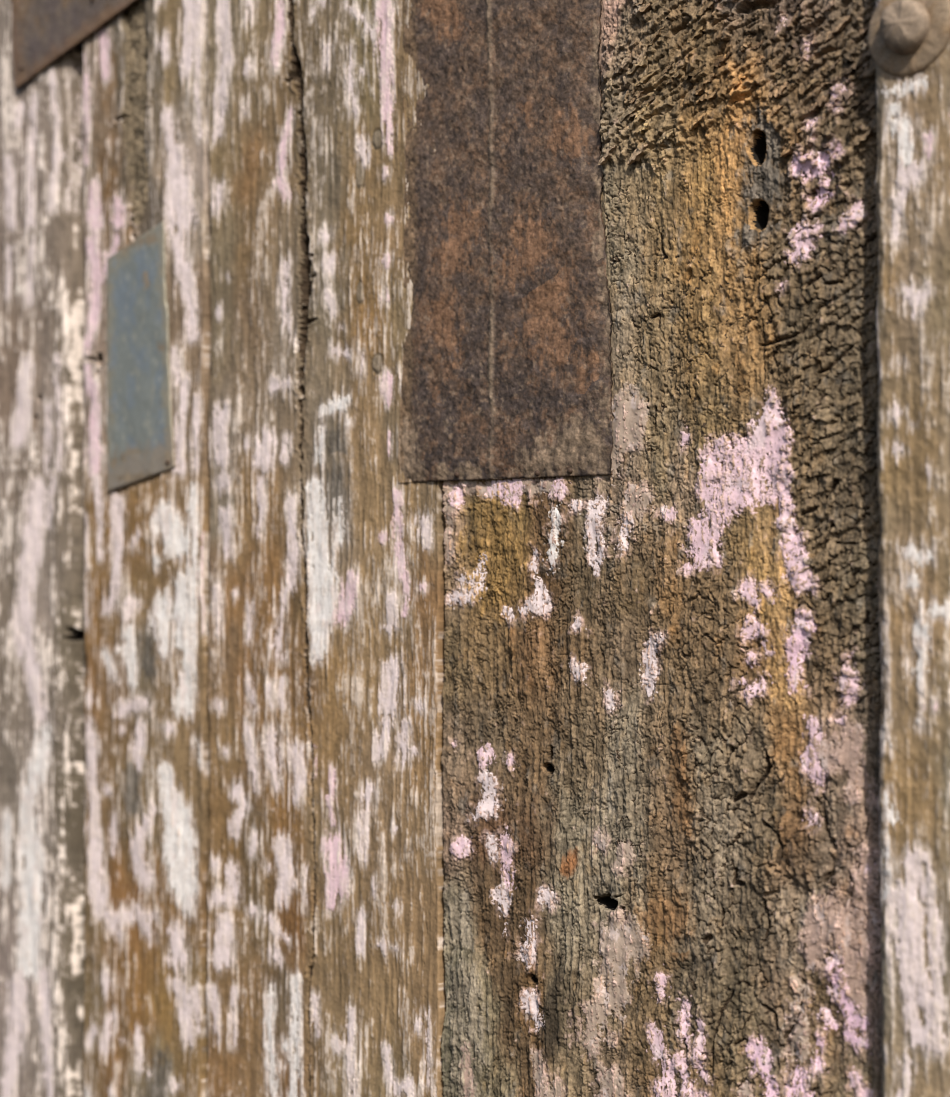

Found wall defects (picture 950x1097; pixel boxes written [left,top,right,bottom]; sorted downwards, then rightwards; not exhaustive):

peeling [345,0,398,181]
rust [410,0,475,55]
peeling [0,351,67,1097]
peeling [3,0,293,774]
peeling [84,690,359,1097]
crack [285,0,317,1096]
peeling [227,394,377,918]
peeling [449,740,545,1033]
rust [398,16,612,633]
peeling [378,382,819,705]
peeling [646,964,713,1097]
peeling [737,651,950,1097]